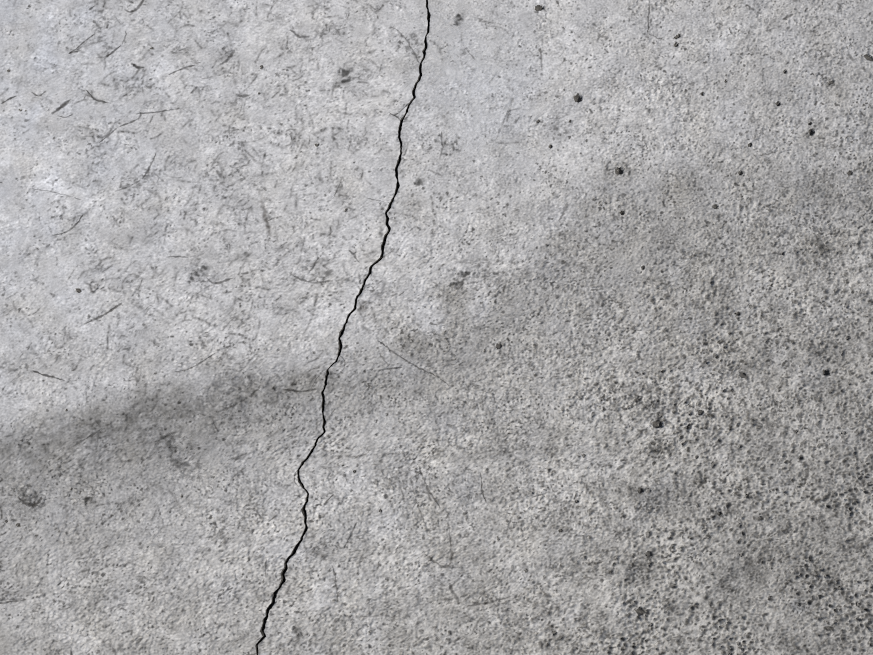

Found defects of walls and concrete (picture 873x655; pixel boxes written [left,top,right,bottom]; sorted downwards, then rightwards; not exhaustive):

crack [255,0,431,655]